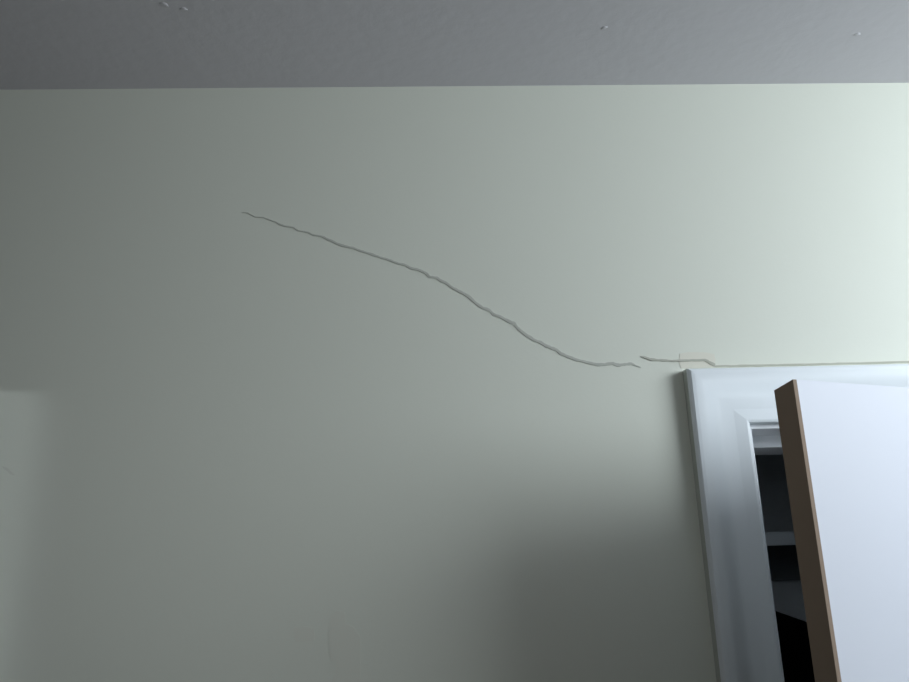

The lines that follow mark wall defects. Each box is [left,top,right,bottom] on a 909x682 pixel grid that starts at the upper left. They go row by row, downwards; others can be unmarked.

crack [242,212,909,368]